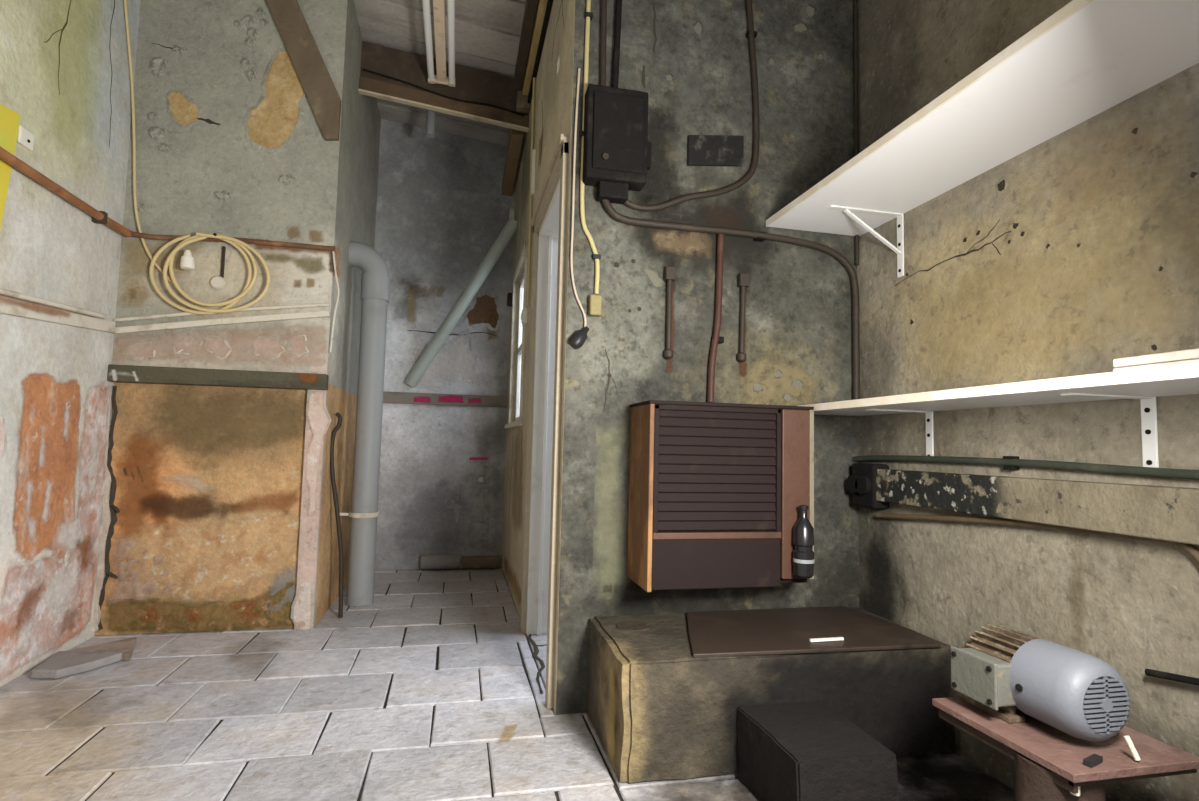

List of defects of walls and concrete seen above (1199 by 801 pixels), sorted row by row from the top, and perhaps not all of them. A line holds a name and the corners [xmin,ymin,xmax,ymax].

spalling [146,89,220,153]
spalling [242,47,307,154]
crack [895,220,1011,286]
spalling [463,292,503,332]
damp [123,440,165,541]
spalling [0,374,332,678]
damp [273,571,296,608]
crack [528,634,547,693]